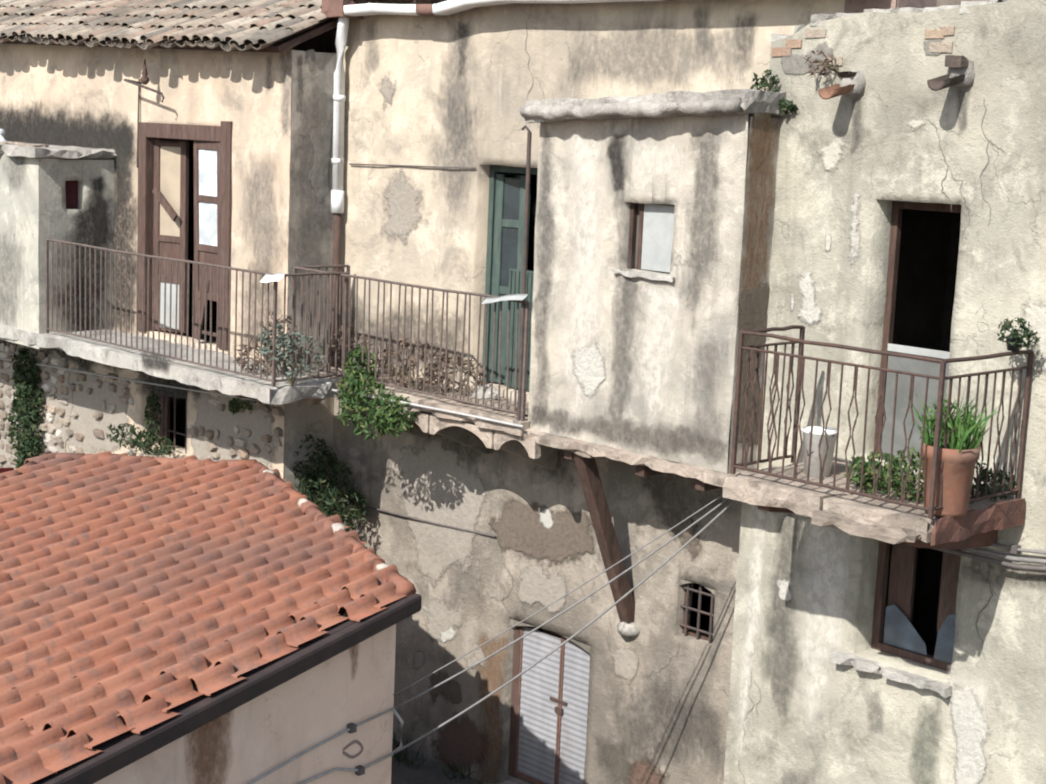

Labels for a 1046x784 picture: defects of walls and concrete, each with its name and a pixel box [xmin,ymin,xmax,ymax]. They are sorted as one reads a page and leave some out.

peeling [379,78,395,110]
peeling [384,170,427,244]
crack [925,98,1006,243]
water stain [532,136,719,457]
peeling [790,272,822,325]
peeling [399,435,594,643]
spalling [429,636,506,783]
spalling [611,648,639,684]
spalling [629,759,666,784]
peeling [948,683,990,784]